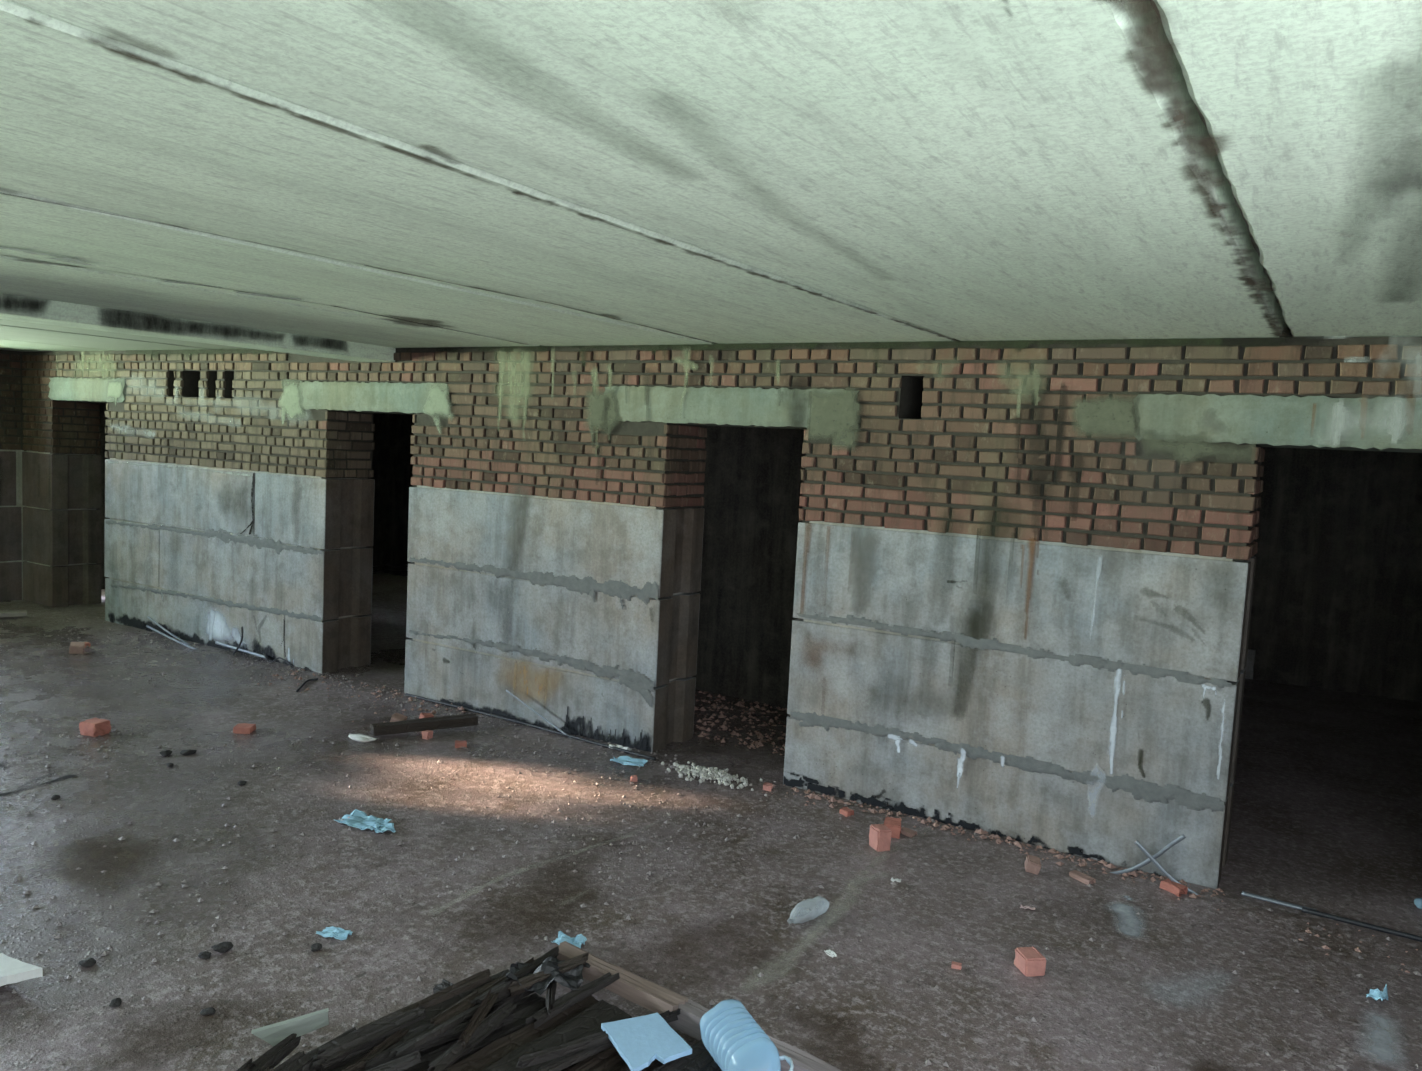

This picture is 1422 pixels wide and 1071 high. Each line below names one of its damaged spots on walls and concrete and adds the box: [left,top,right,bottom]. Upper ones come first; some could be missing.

corrosion [1021,539,1039,639]
damp [888,734,917,753]
damp [957,749,966,788]
damp [1110,669,1125,774]
damp [1202,684,1225,779]